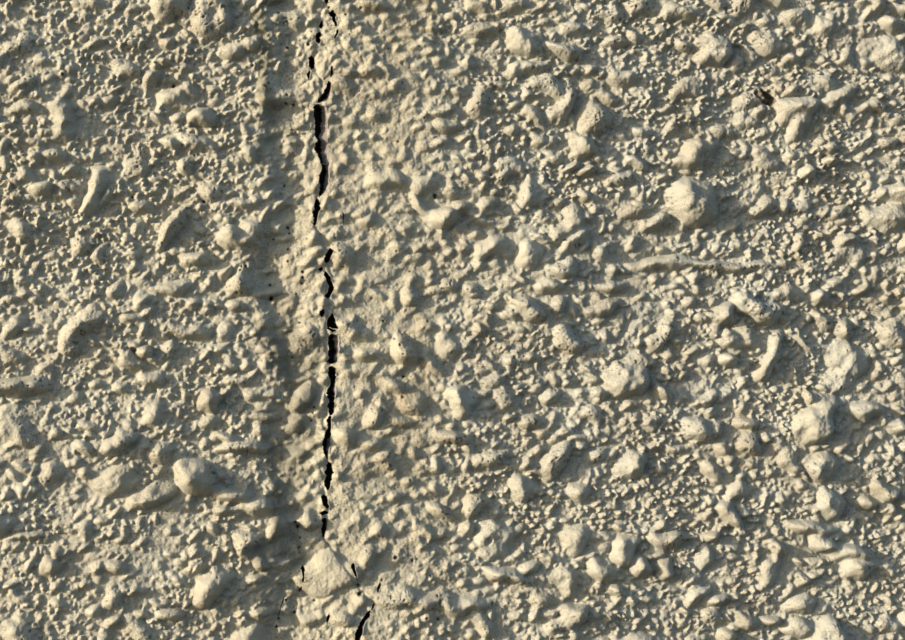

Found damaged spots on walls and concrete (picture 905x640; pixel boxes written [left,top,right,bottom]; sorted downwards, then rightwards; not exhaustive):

crack [306,0,345,226]
crack [317,248,340,539]
crack [277,565,306,617]
crack [350,563,382,640]